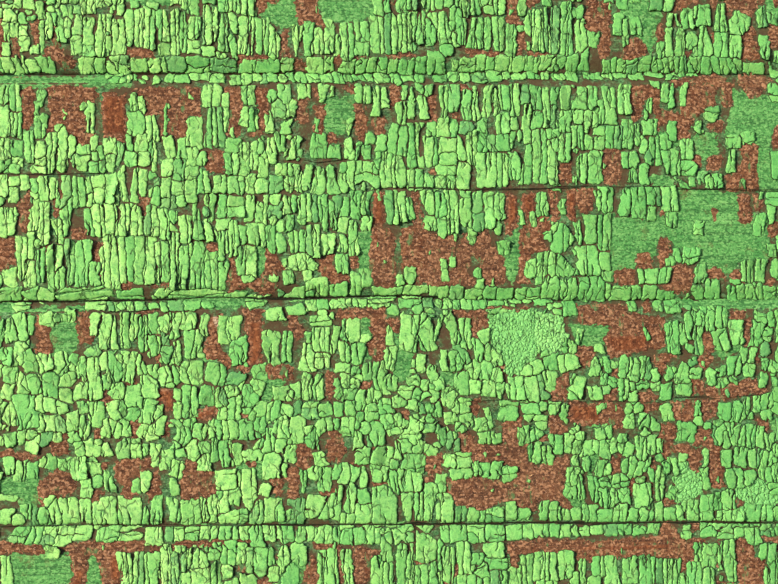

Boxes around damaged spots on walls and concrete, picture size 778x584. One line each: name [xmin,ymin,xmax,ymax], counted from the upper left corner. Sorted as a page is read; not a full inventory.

peeling [0,18,202,146]
crack [0,0,765,291]
peeling [318,160,595,289]
peeling [608,72,778,295]
crack [726,235,778,302]
crack [757,34,778,103]
crack [0,175,703,559]
crack [663,304,778,398]
crack [115,345,778,584]
peeling [424,401,585,512]
peeling [636,377,768,497]
peeling [0,537,251,584]